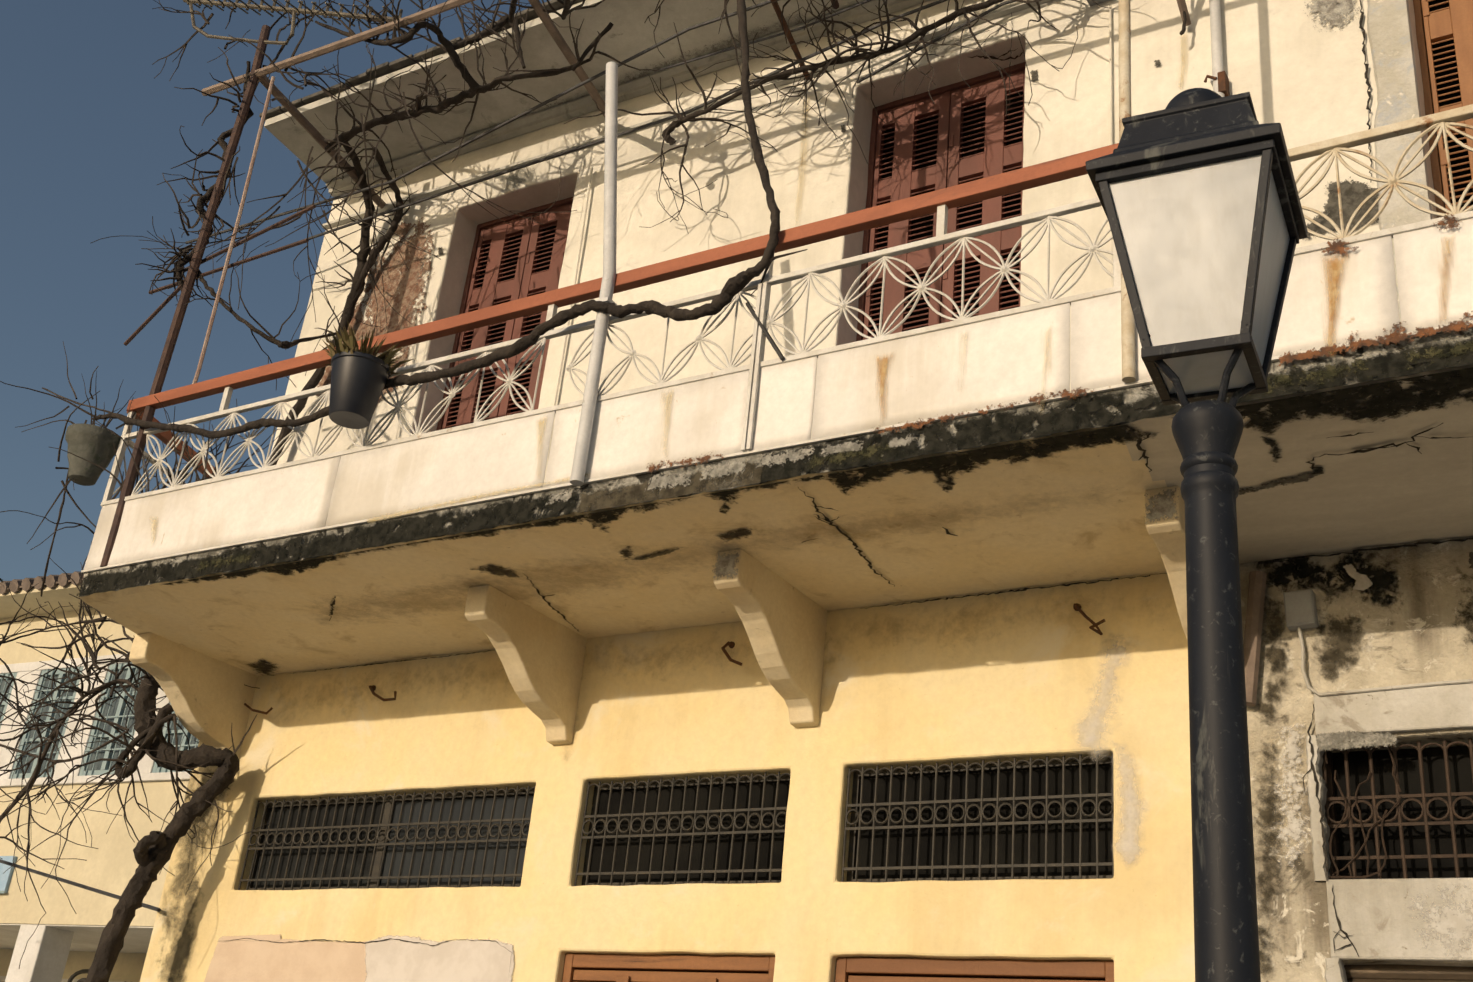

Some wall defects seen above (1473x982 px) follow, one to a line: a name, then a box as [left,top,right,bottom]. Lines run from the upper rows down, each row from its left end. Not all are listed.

flaking render [1303,0,1361,32]
crack [1359,0,1372,183]
flaking render [316,366,332,396]
flaking render [342,217,443,402]
damp [76,340,1473,596]
corrosion [1277,213,1473,367]
crack [1306,423,1465,468]
crack [798,487,1167,609]
damp [1258,551,1402,724]
damp [1452,571,1473,642]
damp [162,774,224,982]
peeling [204,934,514,982]